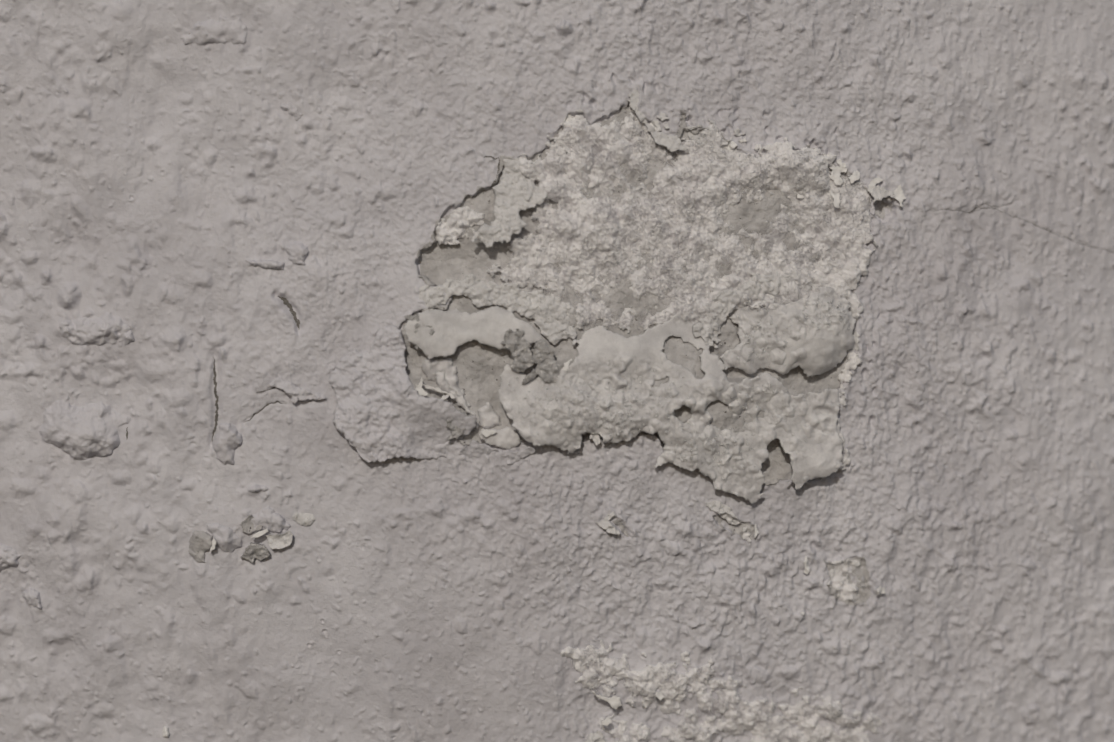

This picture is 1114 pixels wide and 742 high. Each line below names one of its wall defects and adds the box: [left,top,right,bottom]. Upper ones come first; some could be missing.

spalling [328,89,906,465]
spalling [761,439,792,485]